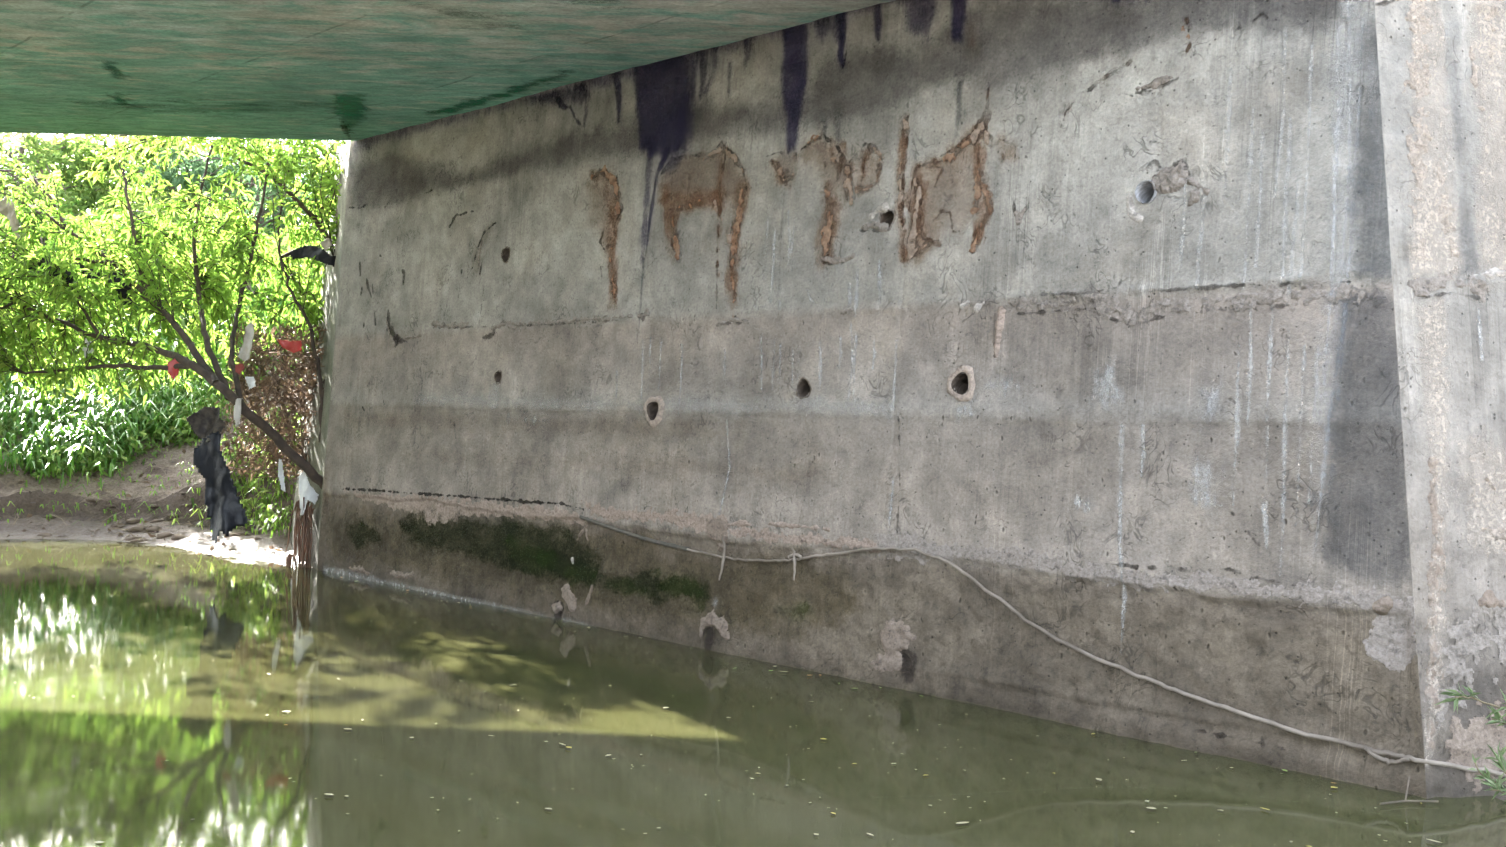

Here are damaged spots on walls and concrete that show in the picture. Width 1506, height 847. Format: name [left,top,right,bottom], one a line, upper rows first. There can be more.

leakage [427,71,564,115]
spalling [359,165,650,347]
leakage [612,55,689,247]
spalling [658,142,750,325]
leakage [781,24,808,153]
leakage [837,12,846,69]
leakage [874,4,882,42]
spalling [771,88,994,265]
leakage [951,0,967,42]
leakage [1402,0,1460,276]
leakage [1469,0,1506,269]